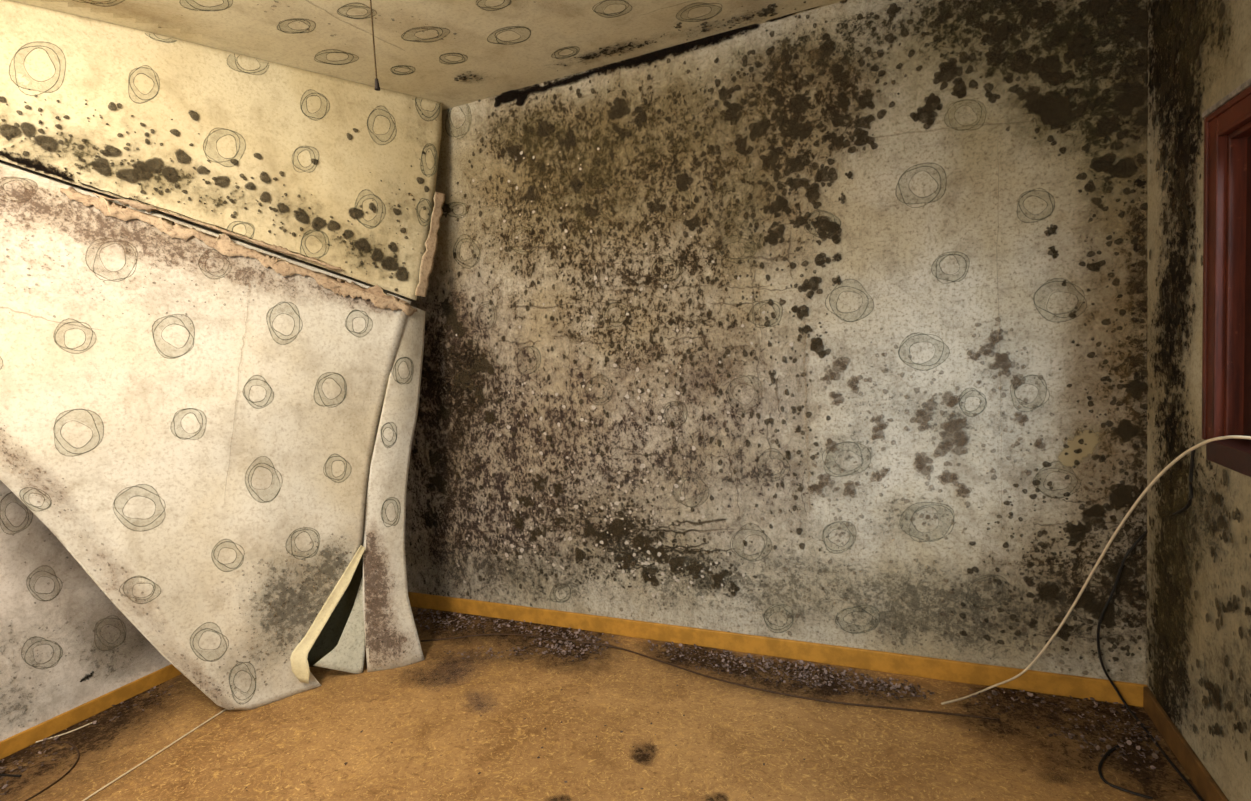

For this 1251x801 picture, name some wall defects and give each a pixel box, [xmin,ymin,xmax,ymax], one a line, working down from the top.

leakage [0,89,430,313]
leakage [405,0,1251,761]
leakage [230,544,348,677]
leakage [363,525,414,667]
leakage [632,745,655,764]